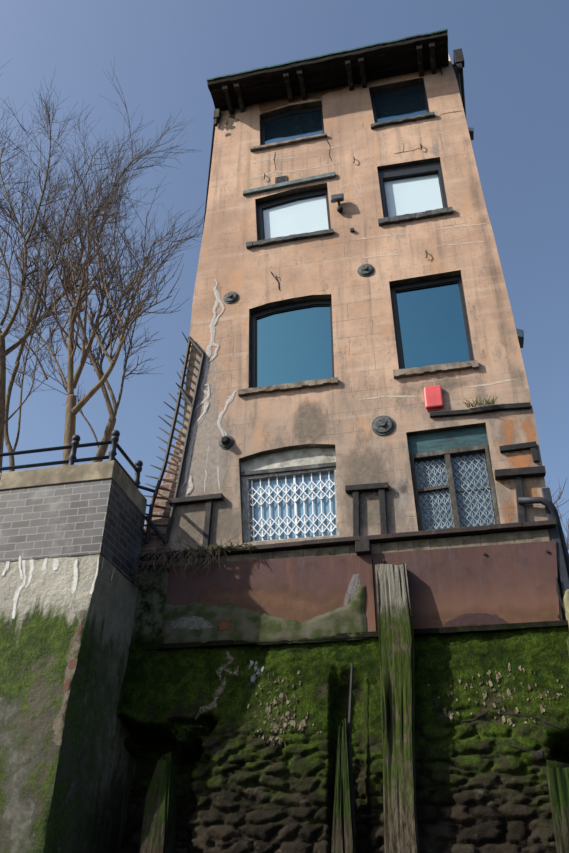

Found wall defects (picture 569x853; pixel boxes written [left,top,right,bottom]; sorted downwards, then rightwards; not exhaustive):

corrosion [510,453,531,468]
damp [2,556,59,619]
spalling [161,584,367,645]
crack [190,650,239,728]